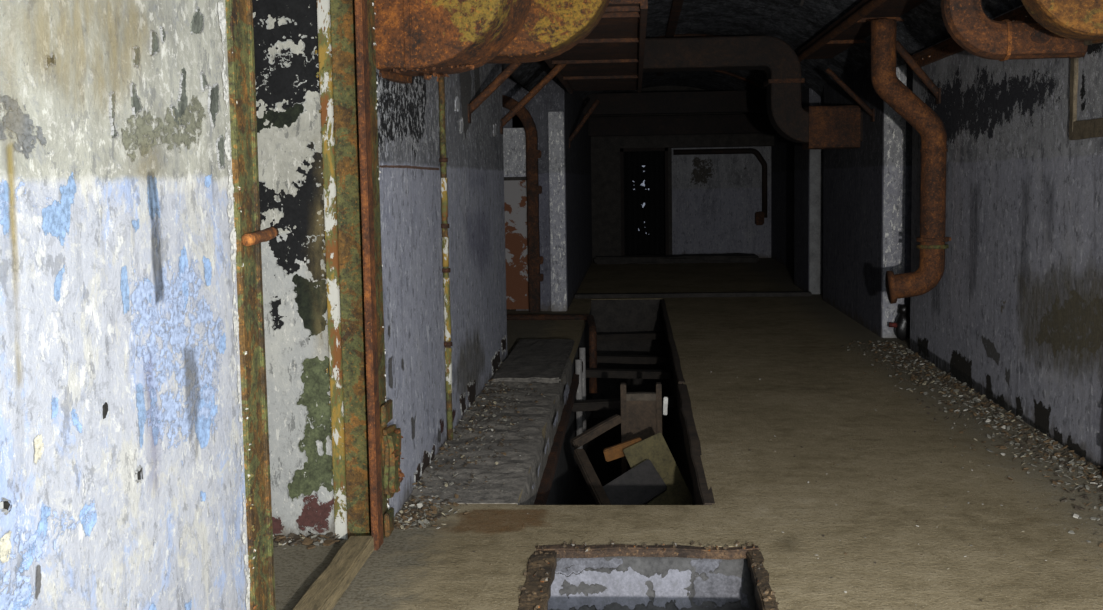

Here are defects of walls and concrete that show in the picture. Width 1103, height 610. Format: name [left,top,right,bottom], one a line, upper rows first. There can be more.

flaking render [44,52,56,70]
peeling [252,0,320,133]
peeling [0,95,49,159]
peeling [0,172,77,246]
peeling [54,264,65,302]
peeling [108,0,244,479]
peeling [259,141,328,340]
flaking render [134,465,143,483]
peeling [272,356,344,551]
peeling [0,497,97,610]
peeling [242,494,250,610]